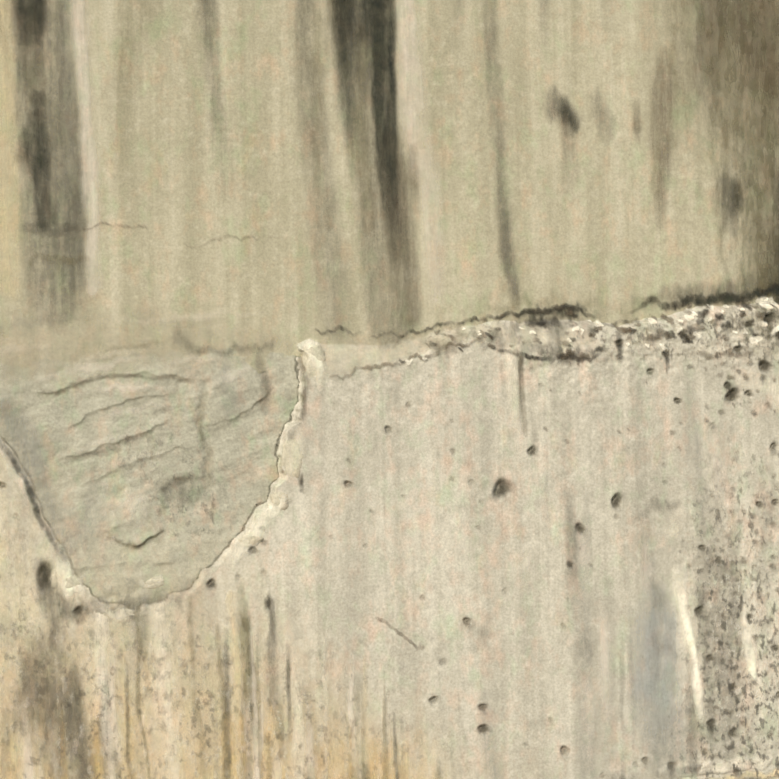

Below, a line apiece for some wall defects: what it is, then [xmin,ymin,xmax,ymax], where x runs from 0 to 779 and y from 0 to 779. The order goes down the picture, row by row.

damp [0,0,97,302]
damp [335,0,417,212]
damp [551,96,576,126]
peeling [713,298,779,344]
spalling [0,342,326,623]
damp [27,582,87,775]
damp [95,613,108,749]
damp [232,608,252,702]